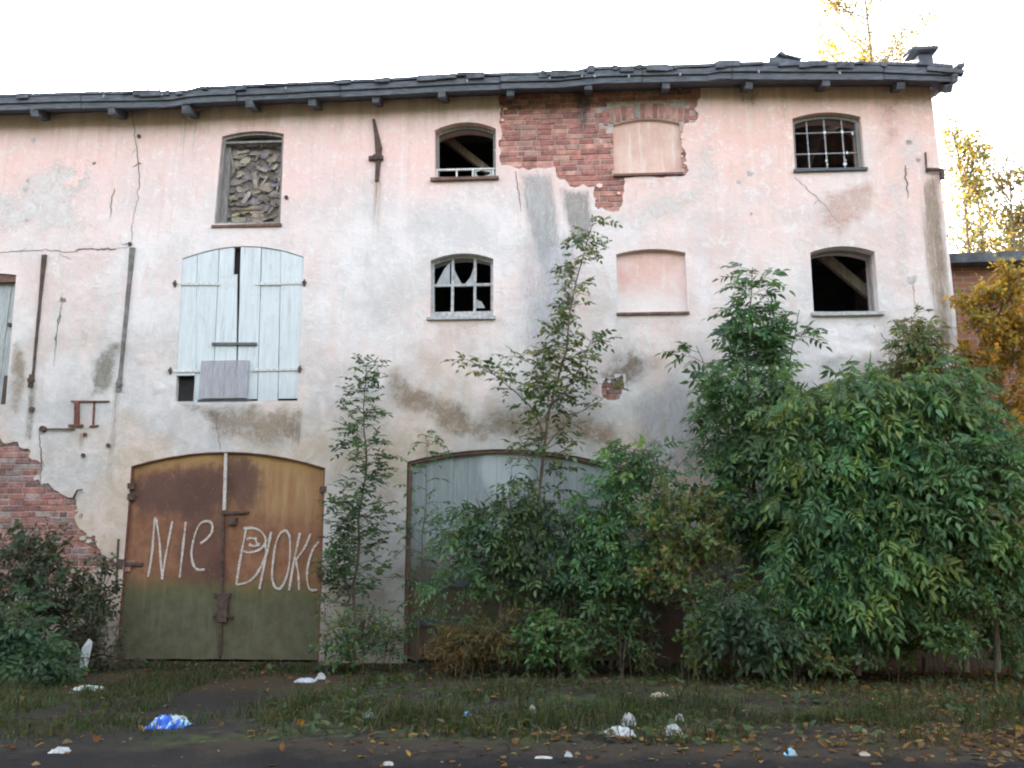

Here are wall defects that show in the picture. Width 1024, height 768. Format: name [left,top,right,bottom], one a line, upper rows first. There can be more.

crack [0,110,141,259]
spalling [494,89,701,212]
crack [794,177,852,222]
water stain [925,181,950,345]
water stain [394,376,610,442]
spalling [595,372,630,404]
spalling [0,439,136,598]